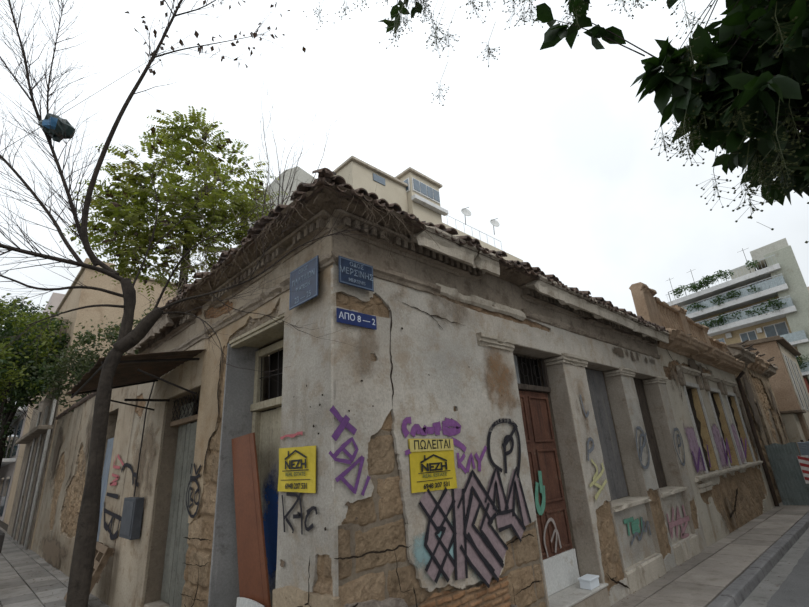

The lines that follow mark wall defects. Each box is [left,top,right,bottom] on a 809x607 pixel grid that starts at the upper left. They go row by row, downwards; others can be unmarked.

flaking render [336,292,390,318]
crack [387,302,466,407]
flaking render [50,446,86,538]
flaking render [181,301,280,607]
crack [297,560,311,607]
crack [334,545,418,607]
flaking render [313,410,546,607]
flaking render [596,501,627,595]
flaking render [647,489,671,559]